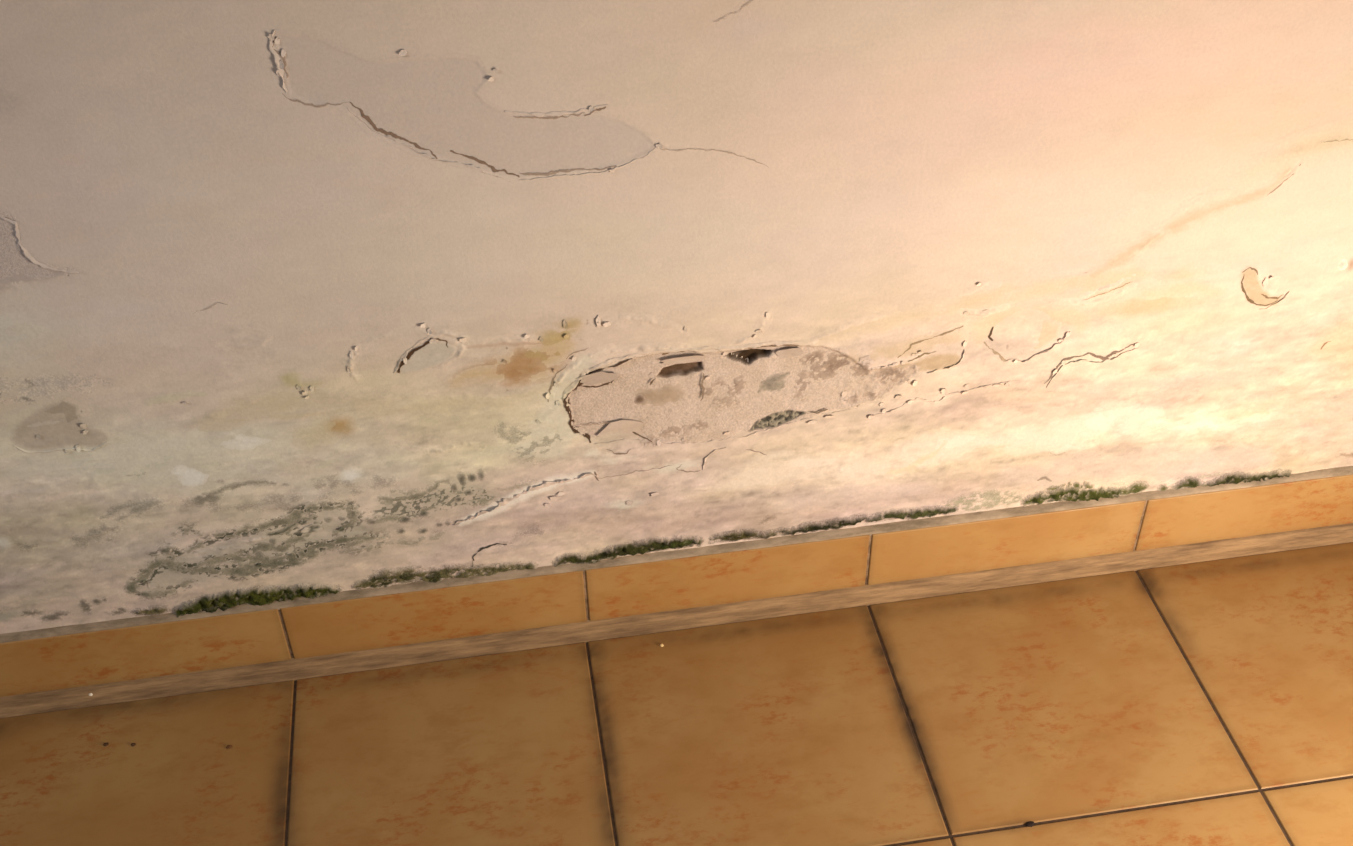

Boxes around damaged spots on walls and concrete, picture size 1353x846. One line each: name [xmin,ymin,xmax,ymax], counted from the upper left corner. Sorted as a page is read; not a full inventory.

peeling [267,29,663,182]
peeling [0,210,88,294]
peeling [8,396,110,454]
leakage [0,324,554,623]
spalling [393,312,1019,528]
leakage [567,313,1353,525]